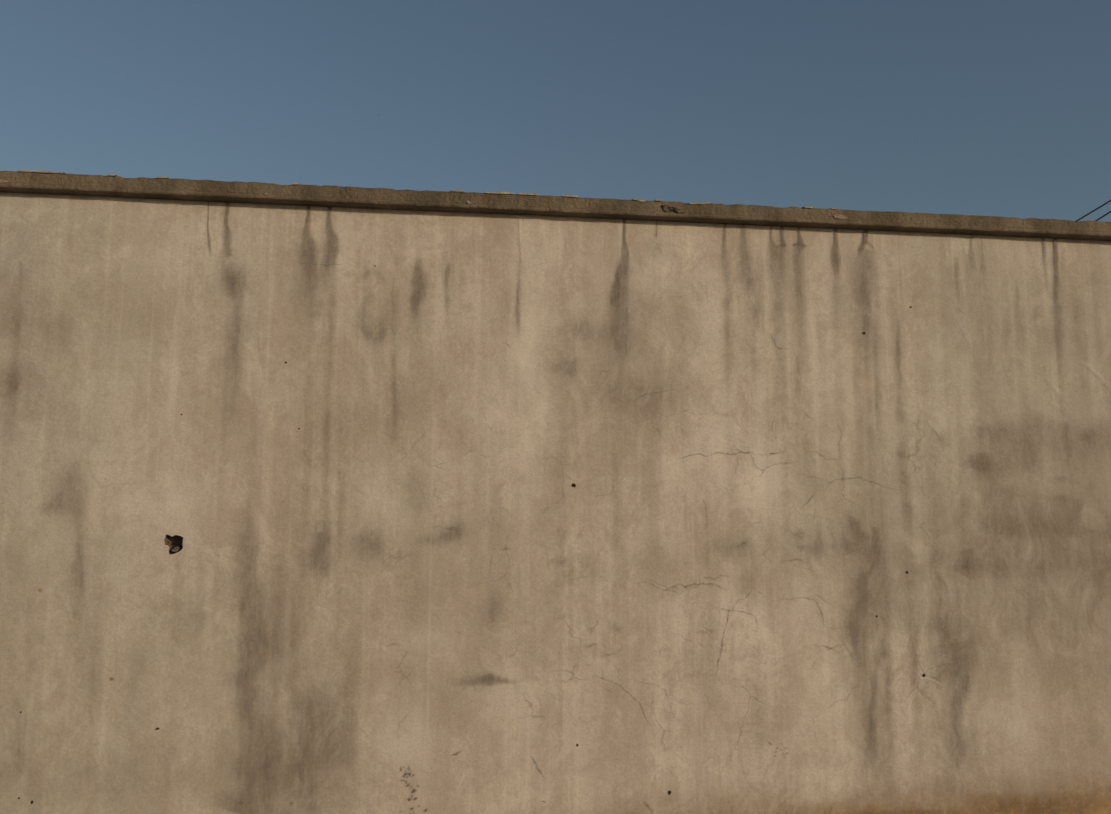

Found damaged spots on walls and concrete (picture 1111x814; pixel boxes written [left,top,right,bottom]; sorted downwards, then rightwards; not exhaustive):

spalling [164,535,183,555]